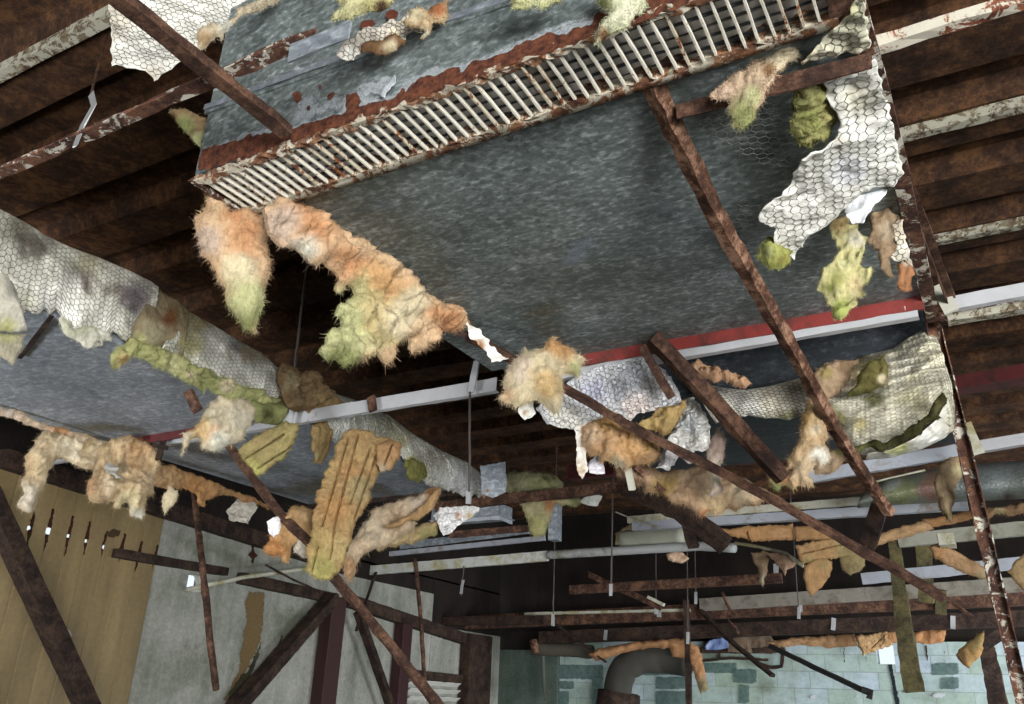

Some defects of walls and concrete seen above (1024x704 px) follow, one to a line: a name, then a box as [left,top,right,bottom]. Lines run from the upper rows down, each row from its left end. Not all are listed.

rust [360,9,398,28]
rust [631,0,690,25]
peeling [357,75,396,98]
rust [198,12,608,170]
rust [280,23,771,202]